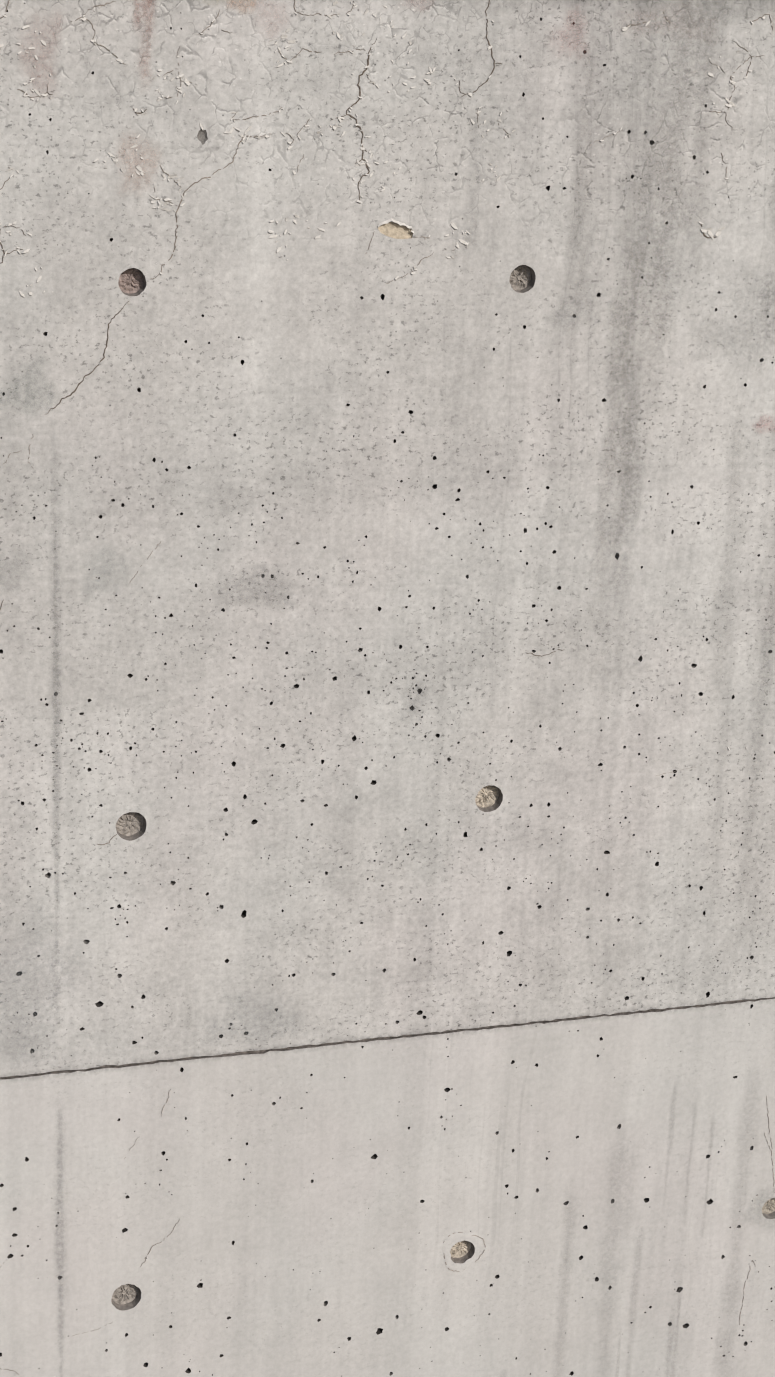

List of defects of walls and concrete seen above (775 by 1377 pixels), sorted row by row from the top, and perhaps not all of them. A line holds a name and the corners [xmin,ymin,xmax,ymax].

crack [17,85,53,101]
crack [71,1,124,64]
crack [133,10,232,116]
crack [153,0,379,279]
crack [459,0,510,136]
crack [622,12,670,31]
crack [695,14,773,179]
crack [0,168,32,263]
peeling [378,218,414,239]
crack [388,235,434,284]
crack [3,301,130,464]